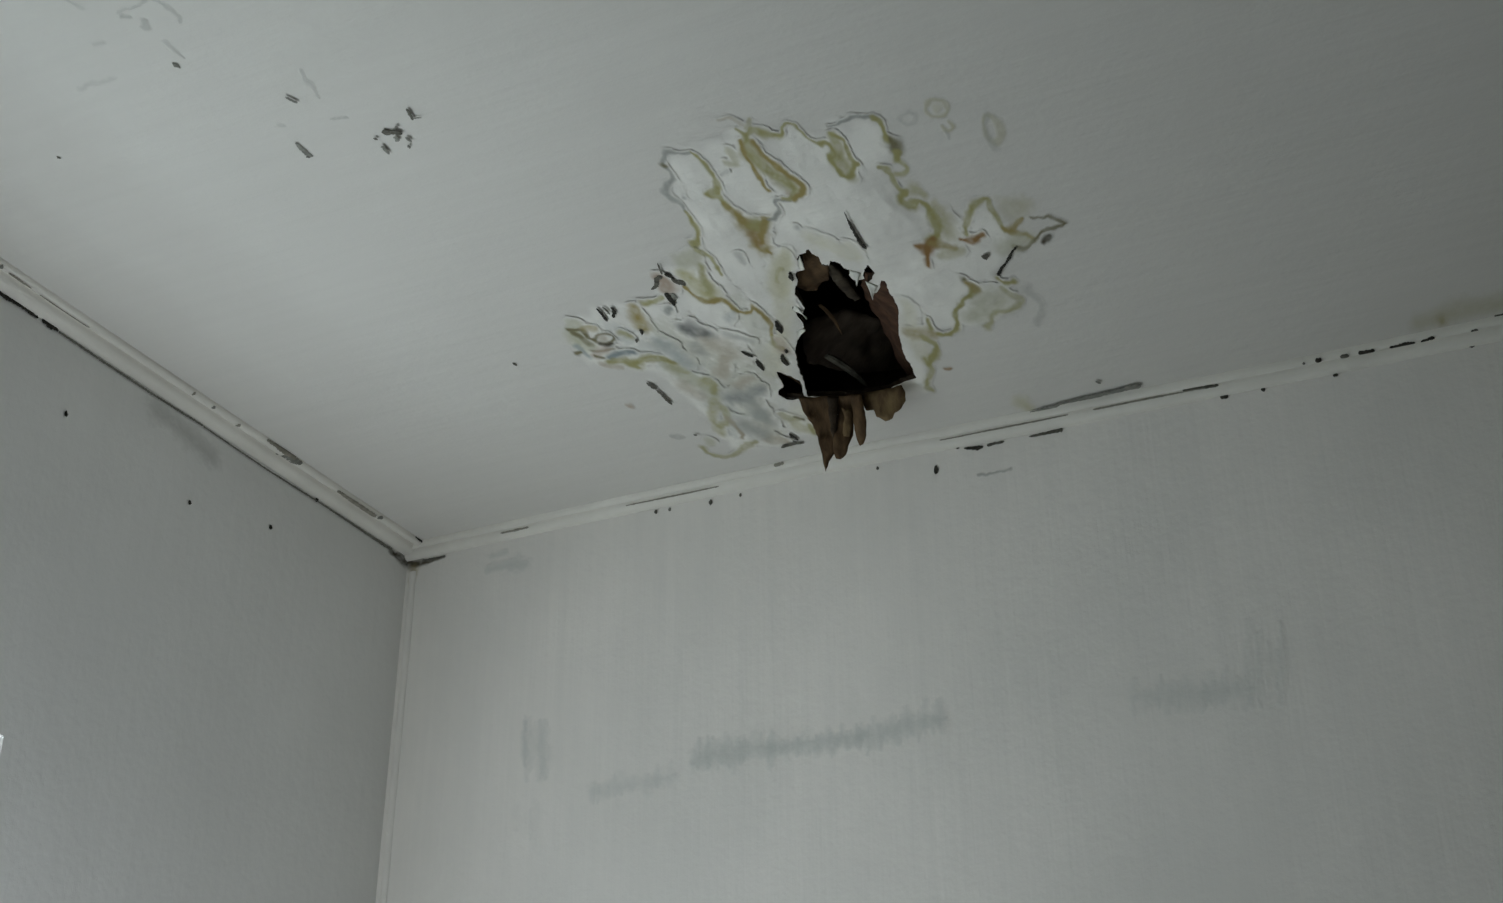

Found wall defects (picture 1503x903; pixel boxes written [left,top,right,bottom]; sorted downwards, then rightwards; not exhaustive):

leakage [551,96,1070,460]
spalling [780,261,907,393]
spalling [1183,384,1228,399]
spalling [1302,336,1435,377]